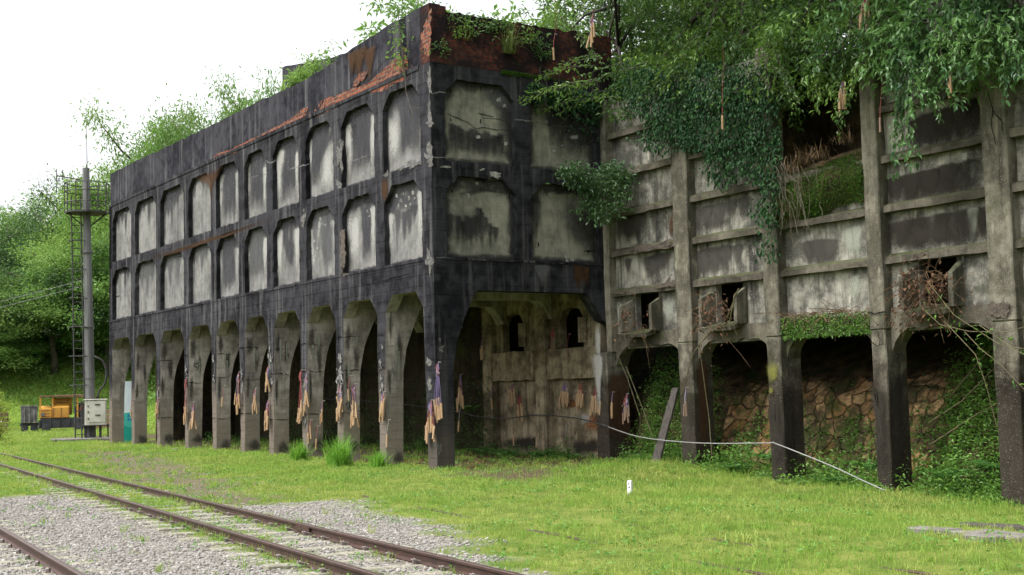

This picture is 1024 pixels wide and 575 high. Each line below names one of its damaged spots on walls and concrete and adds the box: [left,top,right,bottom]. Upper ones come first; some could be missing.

spalling [213,47,414,158]
spalling [383,8,451,177]
leakage [444,81,512,167]
leakage [907,97,980,147]
leakage [446,177,514,259]
leakage [532,184,596,282]
leakage [887,152,979,200]
leakage [889,207,986,247]